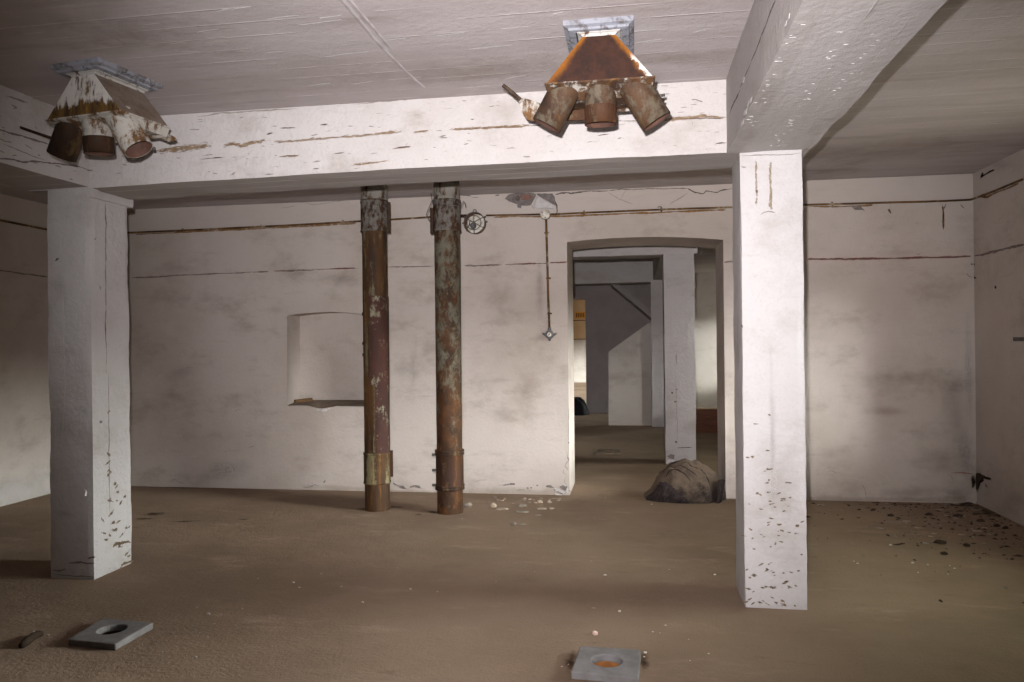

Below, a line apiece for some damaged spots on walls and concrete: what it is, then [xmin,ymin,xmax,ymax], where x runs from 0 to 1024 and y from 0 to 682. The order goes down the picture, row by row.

rust [155,131,401,159]
rust [665,114,726,125]
crack [555,153,798,215]
spalling [101,453,133,568]
spalling [743,468,804,549]
spalling [744,563,800,607]